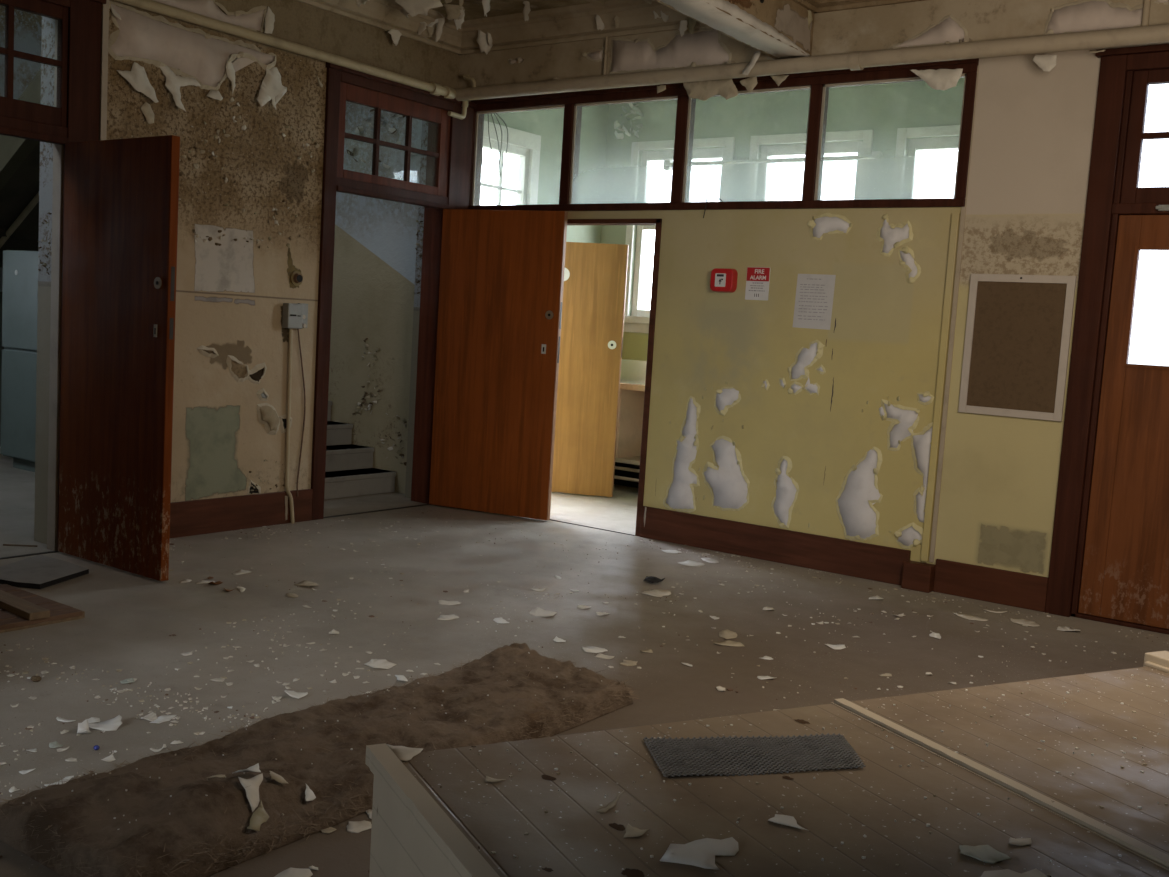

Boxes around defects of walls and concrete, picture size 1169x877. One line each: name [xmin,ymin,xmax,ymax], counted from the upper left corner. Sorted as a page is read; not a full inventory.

peeling [388,29,402,46]
peeling [395,0,465,42]
peeling [476,30,493,55]
peeling [108,0,287,206]
peeling [807,213,853,240]
peeling [876,214,921,283]
spalling [197,345,292,435]
peeling [761,340,826,396]
peeling [663,387,750,513]
peeling [771,456,799,528]
peeling [835,391,934,549]